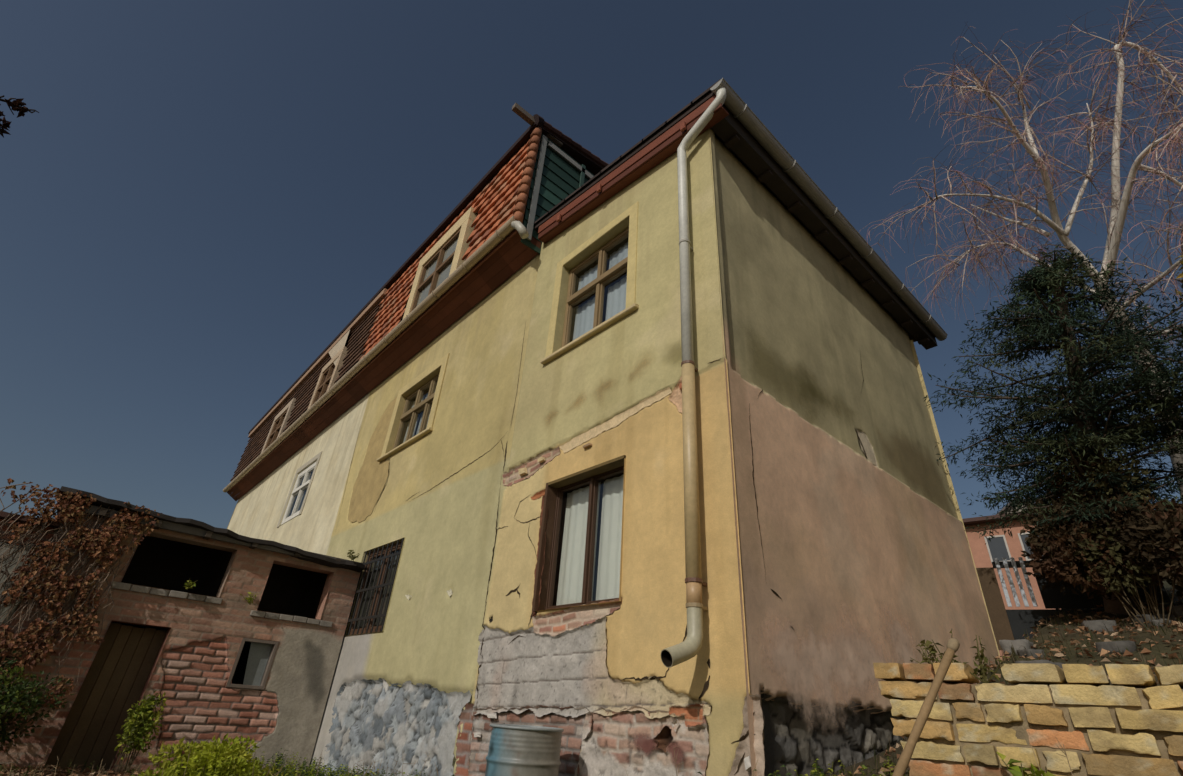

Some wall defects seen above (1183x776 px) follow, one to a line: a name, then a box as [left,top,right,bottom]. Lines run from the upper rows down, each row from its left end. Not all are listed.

peeling [348,395,398,523]
flaking render [502,376,682,486]
crack [380,330,542,769]
flaking render [322,489,712,776]
flaking render [157,638,279,768]
flaking render [728,690,906,776]